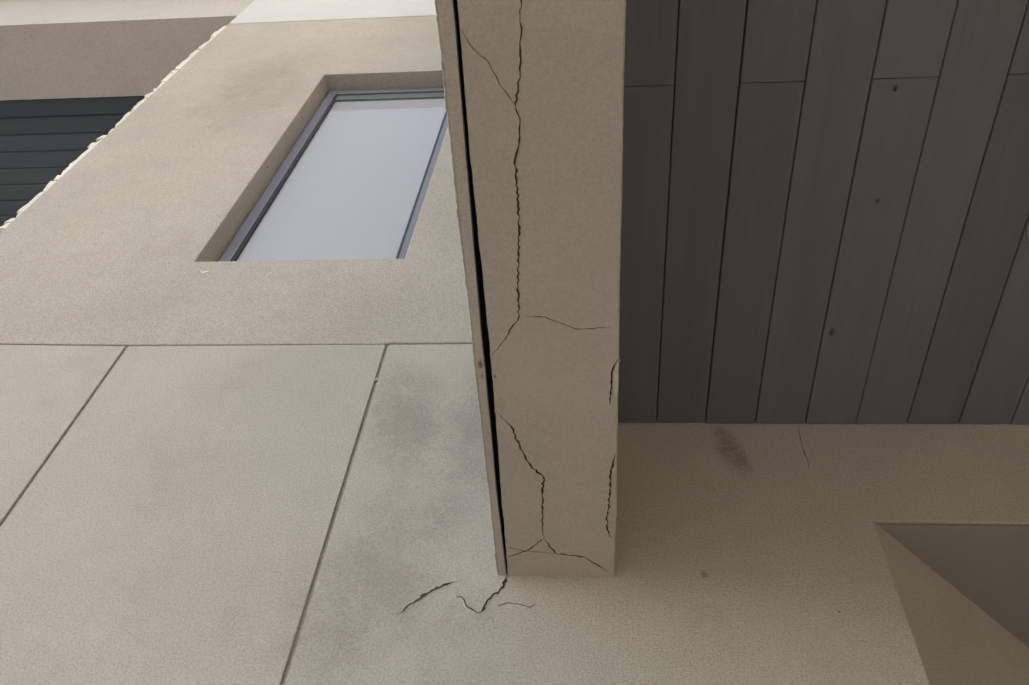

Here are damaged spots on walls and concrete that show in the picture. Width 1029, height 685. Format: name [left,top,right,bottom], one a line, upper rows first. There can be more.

crack [390,0,610,615]
crack [607,359,620,405]
crack [604,454,619,538]